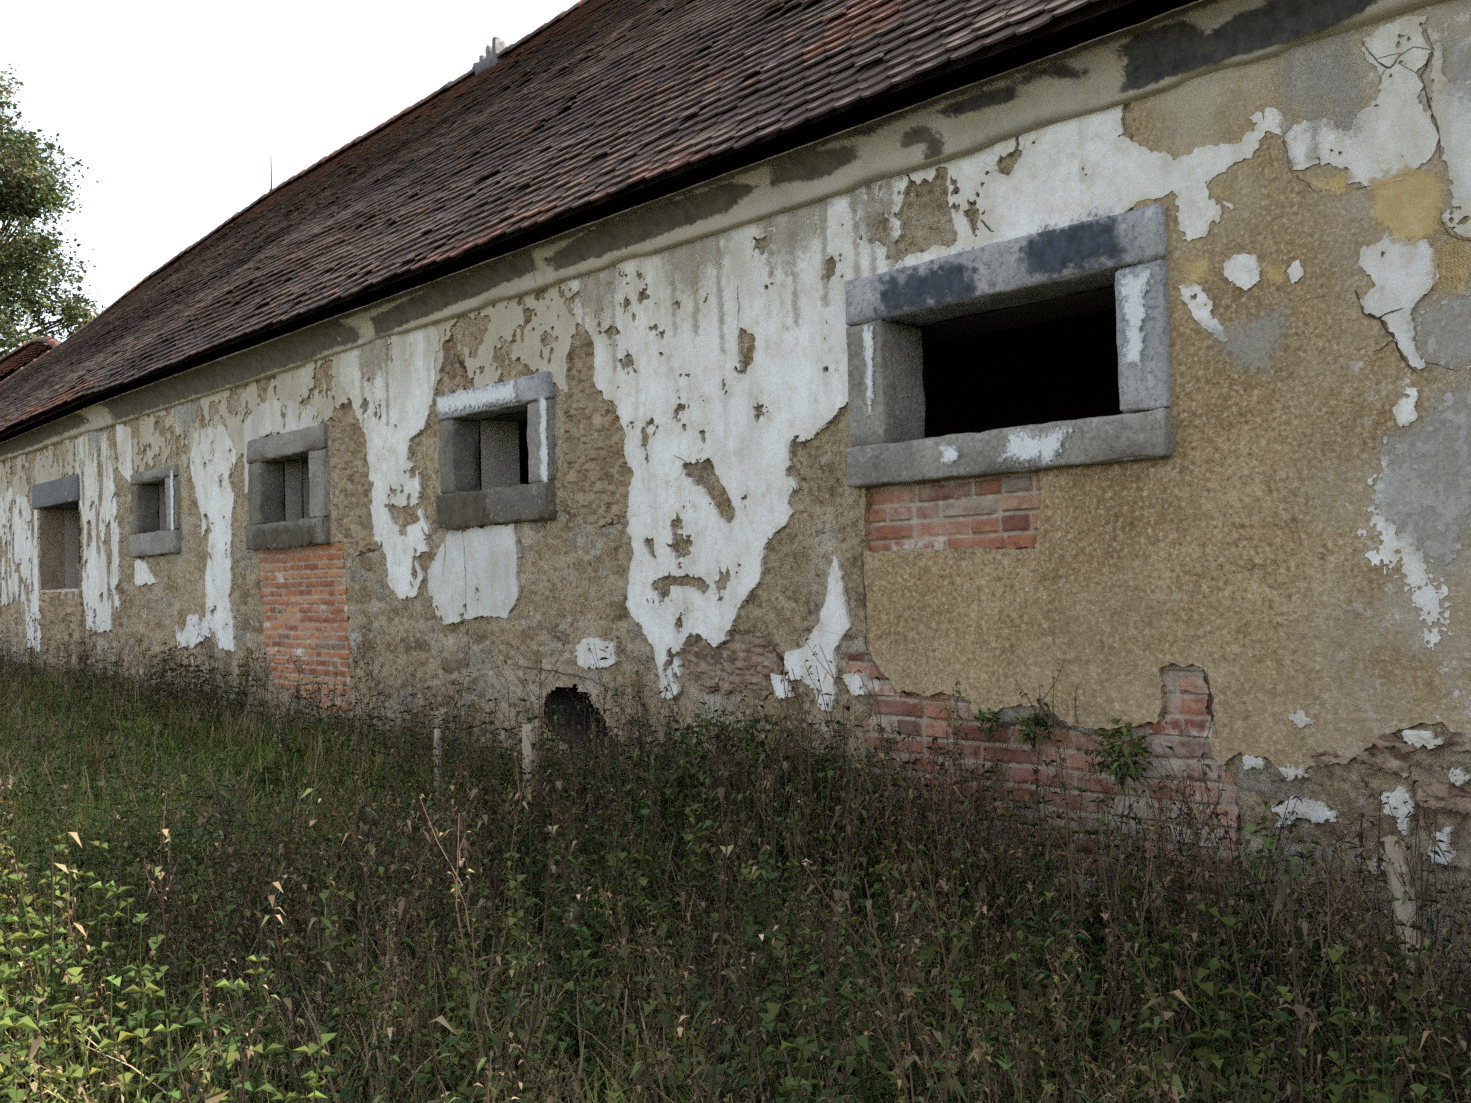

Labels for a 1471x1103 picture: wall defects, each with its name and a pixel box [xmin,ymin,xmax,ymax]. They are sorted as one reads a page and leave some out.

damp [0,0,1377,469]
damp [1309,165,1471,295]
peeling [0,15,1471,700]
damp [170,467,189,530]
damp [538,396,549,482]
flaking render [770,555,1241,906]
flaking render [1306,748,1338,767]
flaking render [1356,732,1471,816]